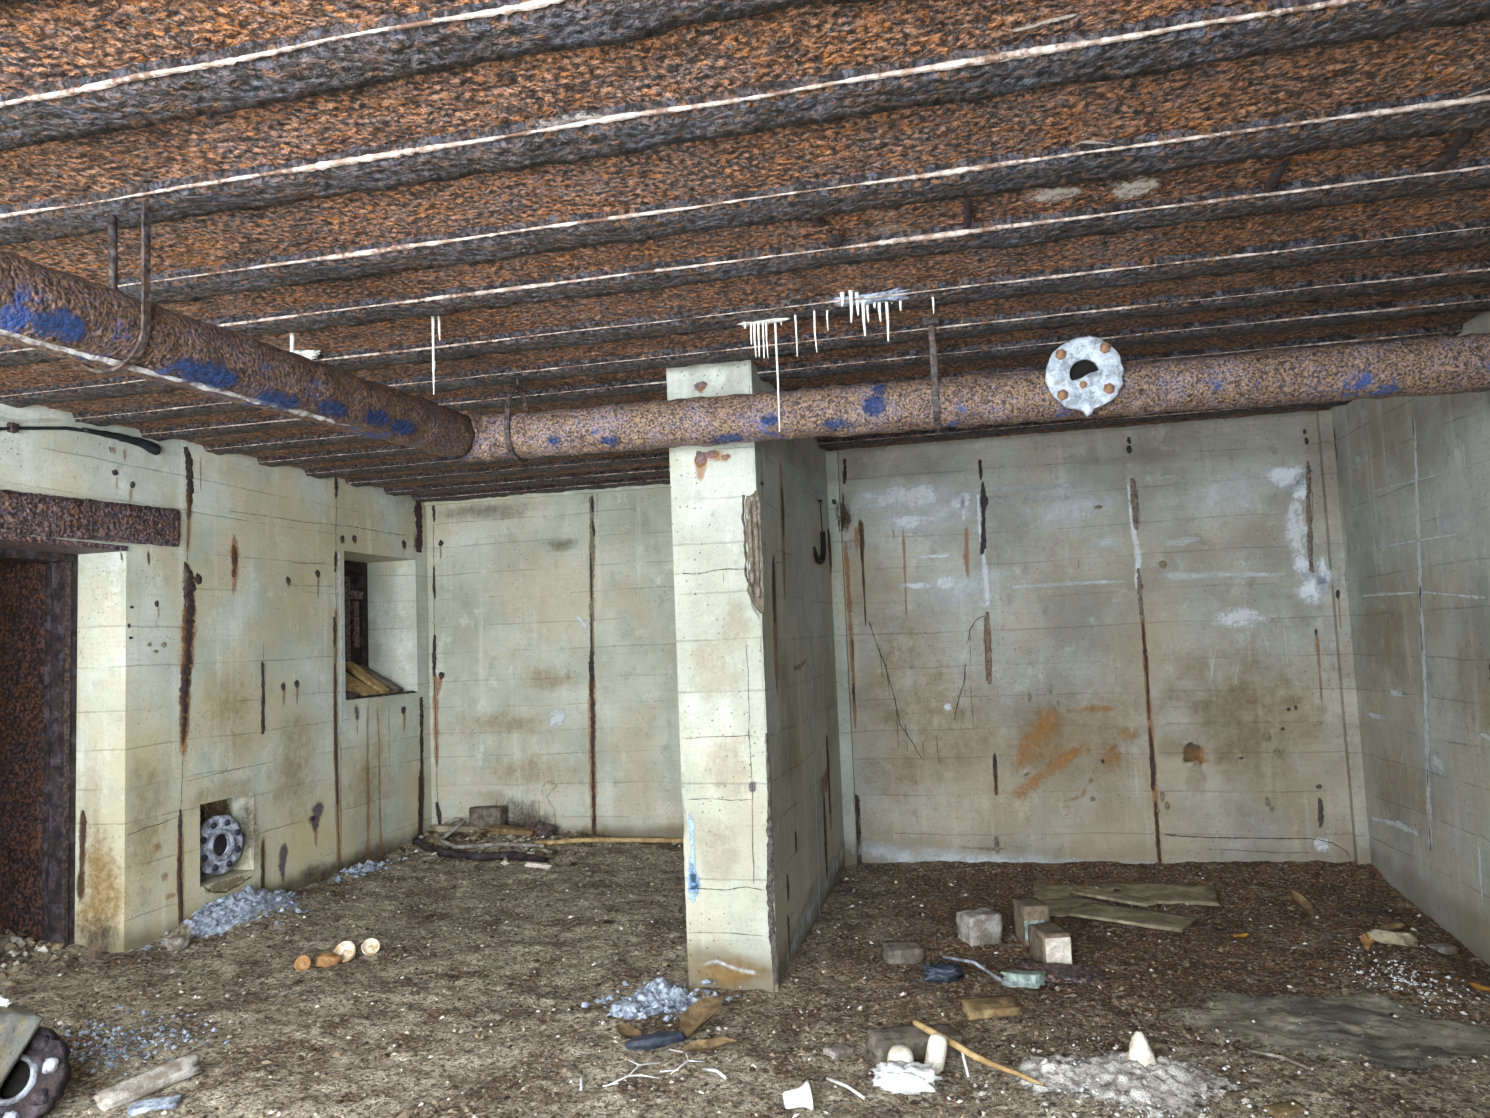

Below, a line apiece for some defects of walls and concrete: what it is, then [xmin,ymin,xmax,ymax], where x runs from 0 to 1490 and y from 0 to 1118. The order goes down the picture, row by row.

water stain [118,88,1490,287]
corrosion [812,217,844,248]
water stain [217,165,1490,327]
water stain [313,227,1490,386]
corrosion [694,381,708,391]
corrosion [694,450,731,468]
spalling [741,490,764,613]
water stain [1264,466,1332,604]
crack [869,616,983,759]